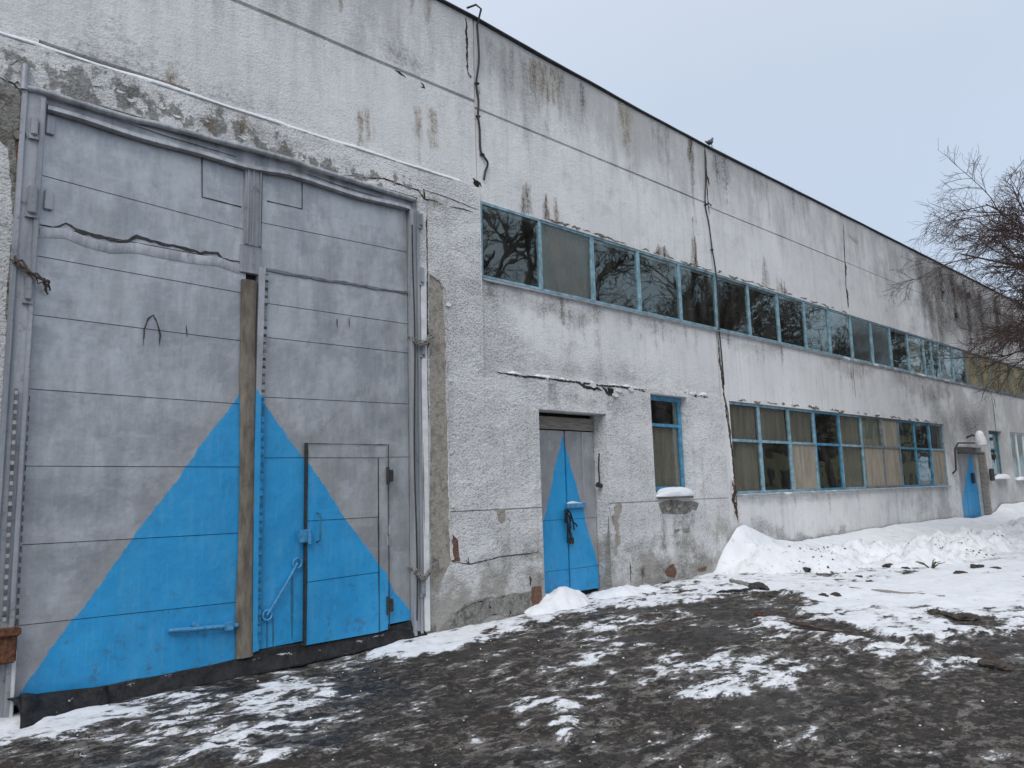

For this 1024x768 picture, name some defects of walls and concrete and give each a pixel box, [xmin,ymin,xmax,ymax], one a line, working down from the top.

peeling [0,44,412,218]
crack [705,157,713,214]
crack [842,226,850,307]
water stain [916,263,1015,342]
flaking render [429,273,460,595]
crack [718,339,738,520]
spalling [658,499,699,514]
flaking render [440,577,542,631]